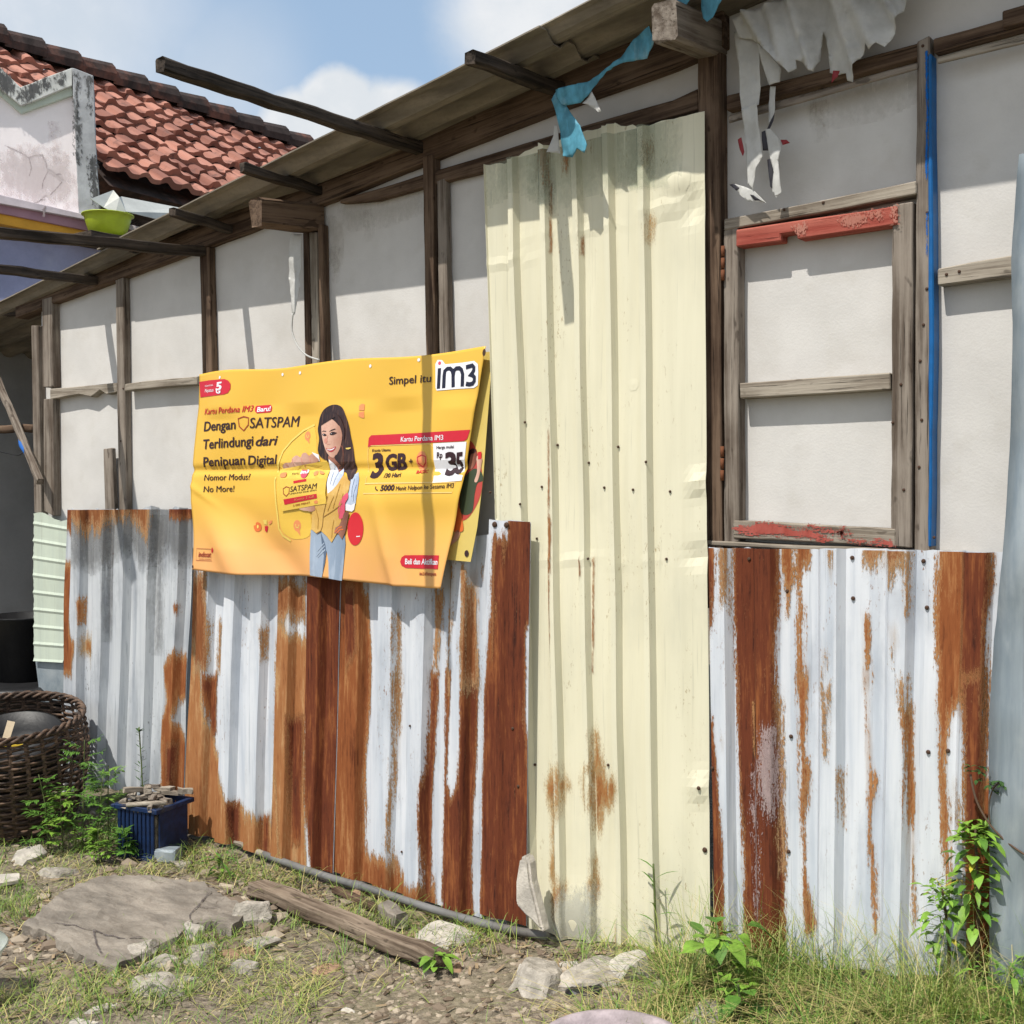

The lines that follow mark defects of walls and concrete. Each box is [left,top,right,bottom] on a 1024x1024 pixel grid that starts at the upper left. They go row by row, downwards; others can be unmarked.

crack [11,148,62,203]
damp [0,68,101,209]
peeling [837,204,900,228]
rust [64,558,92,680]
rust [67,509,153,548]
peeling [731,521,897,548]
rust [160,521,530,926]
rust [547,730,616,920]
rust [708,548,848,962]
rust [863,611,880,935]
rust [891,643,916,831]
rust [932,551,997,981]